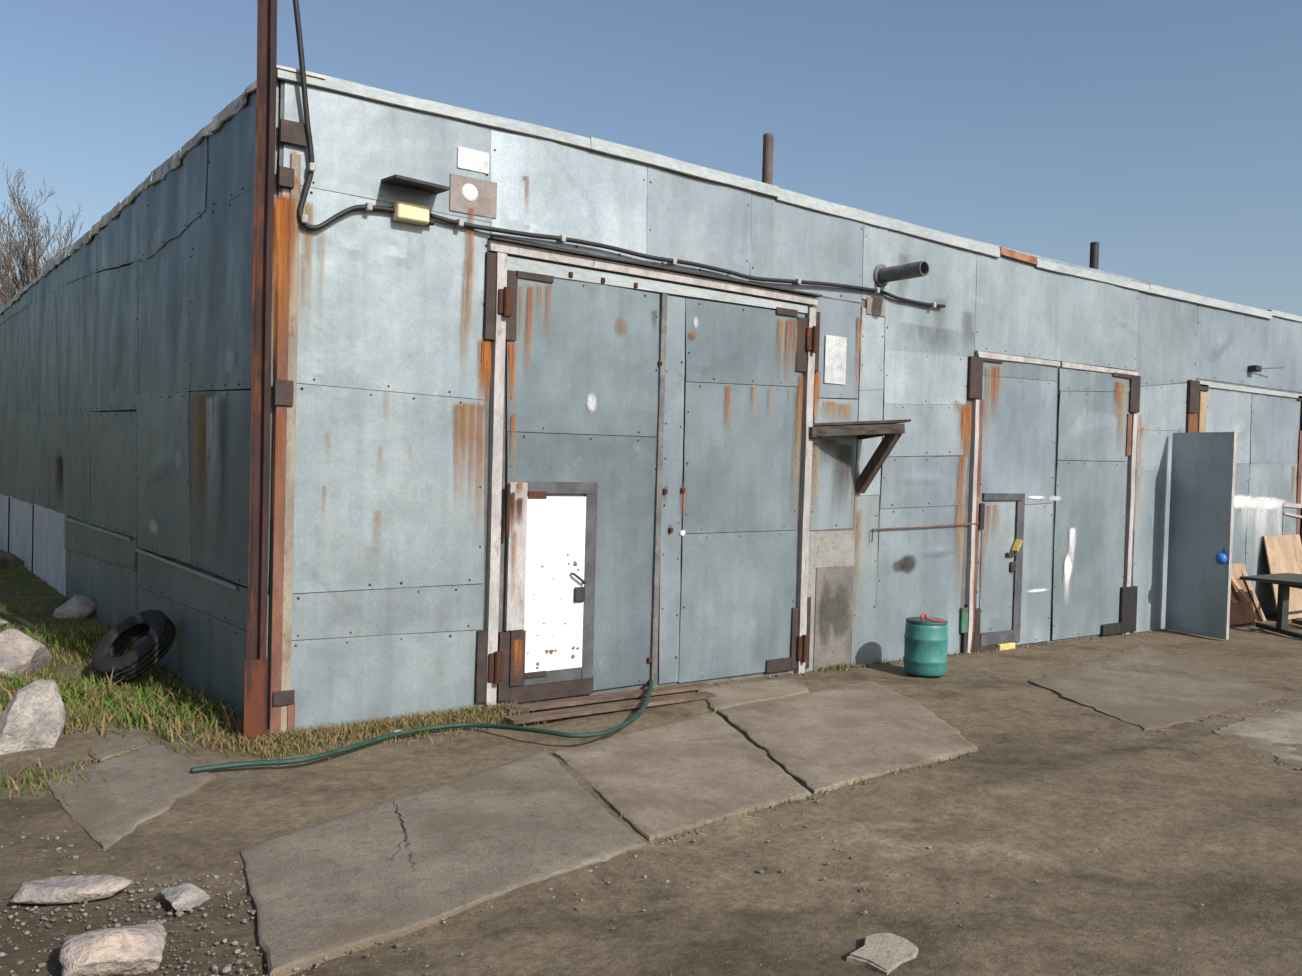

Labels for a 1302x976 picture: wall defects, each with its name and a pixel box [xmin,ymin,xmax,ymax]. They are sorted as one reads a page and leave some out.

corrosion [273,194,313,306]
corrosion [479,339,491,386]
corrosion [509,285,549,389]
corrosion [779,320,798,356]
corrosion [454,404,484,469]
corrosion [1116,382,1147,455]
corrosion [957,402,972,555]
corrosion [510,482,523,560]
corrosion [514,640,522,661]
damp [820,591,849,642]